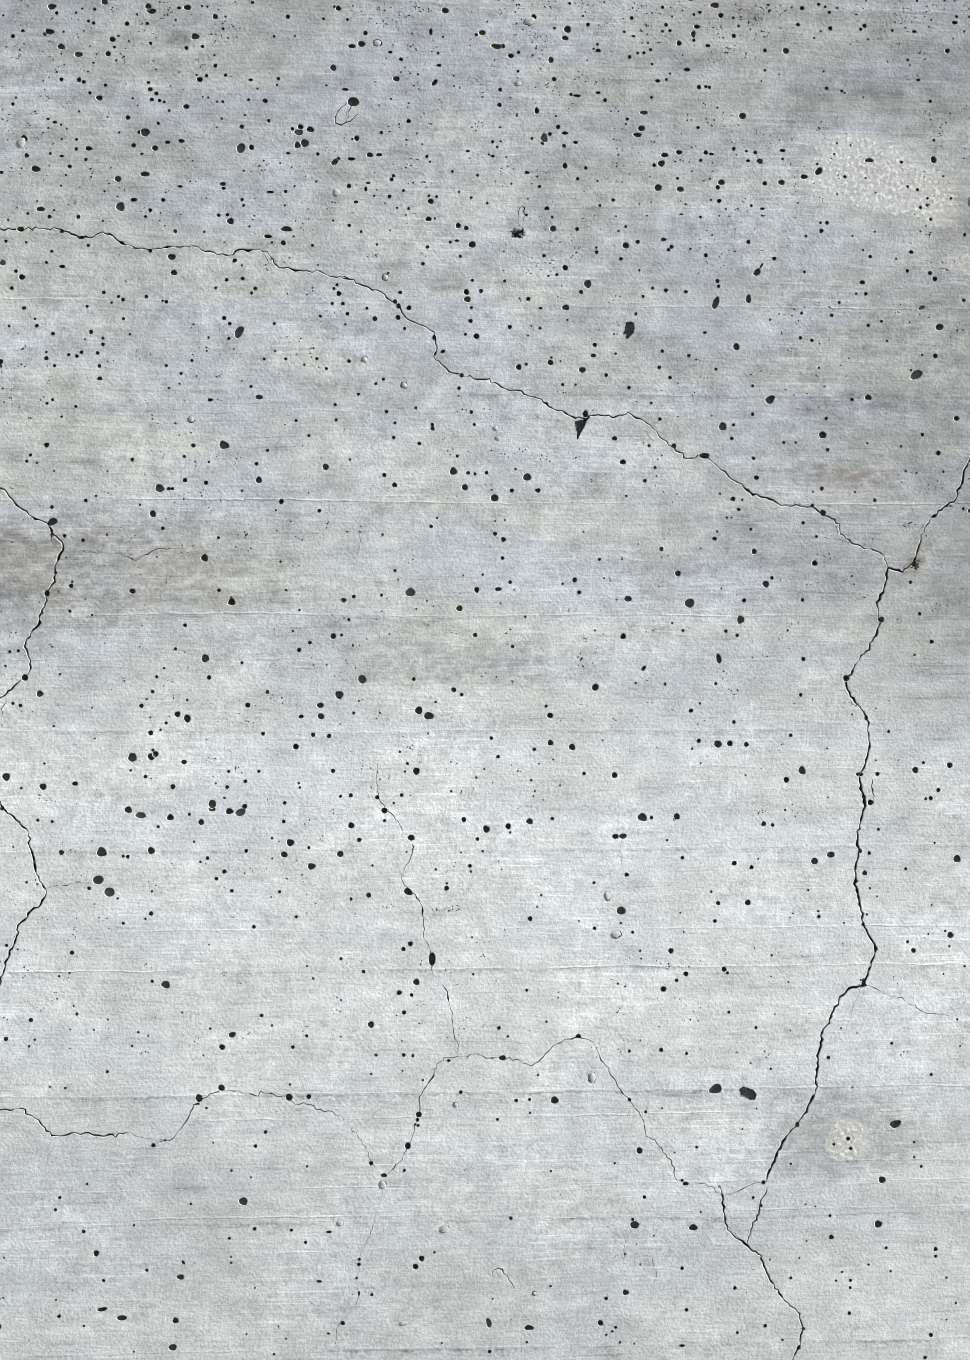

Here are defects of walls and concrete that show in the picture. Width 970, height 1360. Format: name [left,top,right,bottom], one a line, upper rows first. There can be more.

crack [334,101,358,126]
crack [0,226,970,1184]
crack [491,1268,514,1288]
crack [719,1182,804,1360]